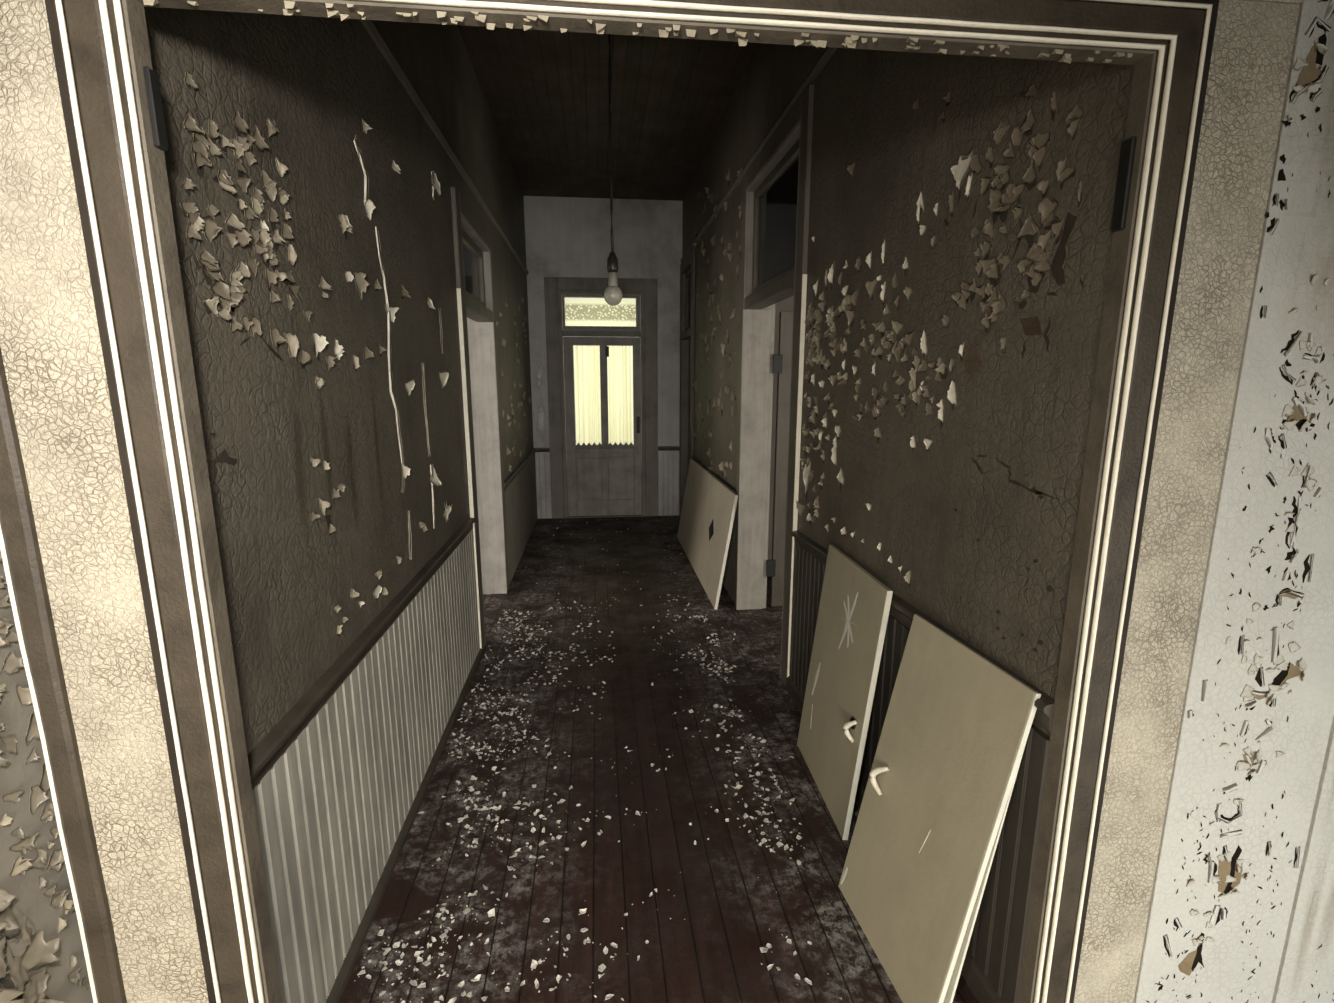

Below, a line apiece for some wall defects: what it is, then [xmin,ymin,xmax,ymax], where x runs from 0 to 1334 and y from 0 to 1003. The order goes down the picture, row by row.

peeling [184,71,198,89]
peeling [1282,16,1331,137]
peeling [180,110,452,565]
peeling [796,240,964,587]
peeling [916,84,1084,358]
peeling [1253,330,1334,466]
peeling [334,570,388,636]
peeling [0,554,90,1003]
flaking render [1147,558,1307,1003]